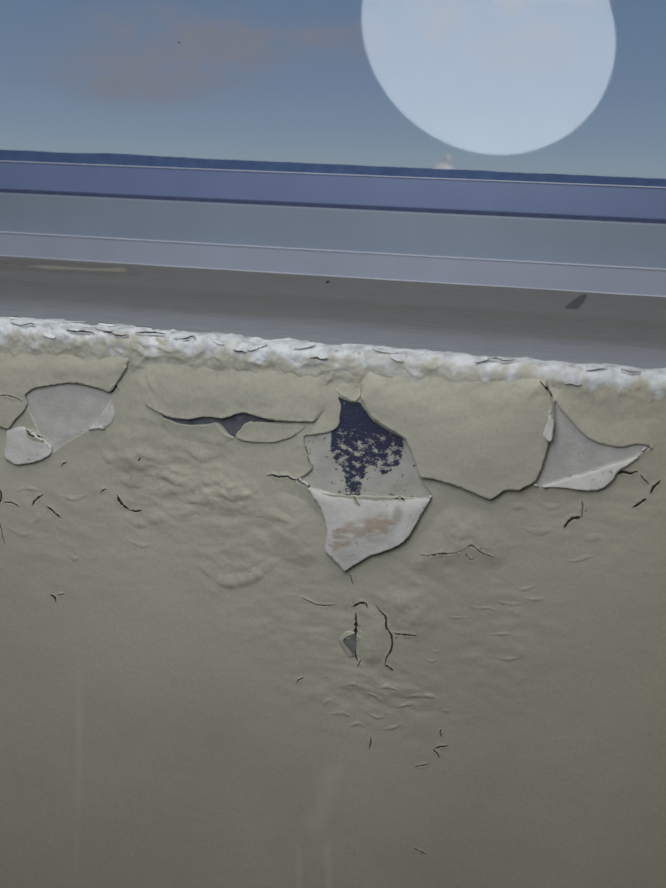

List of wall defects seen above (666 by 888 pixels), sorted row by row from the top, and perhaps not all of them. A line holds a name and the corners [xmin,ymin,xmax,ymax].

peeling [0,316,666,572]
crack [0,482,62,544]
crack [562,500,588,528]
crack [615,467,662,510]
crack [301,573,417,671]